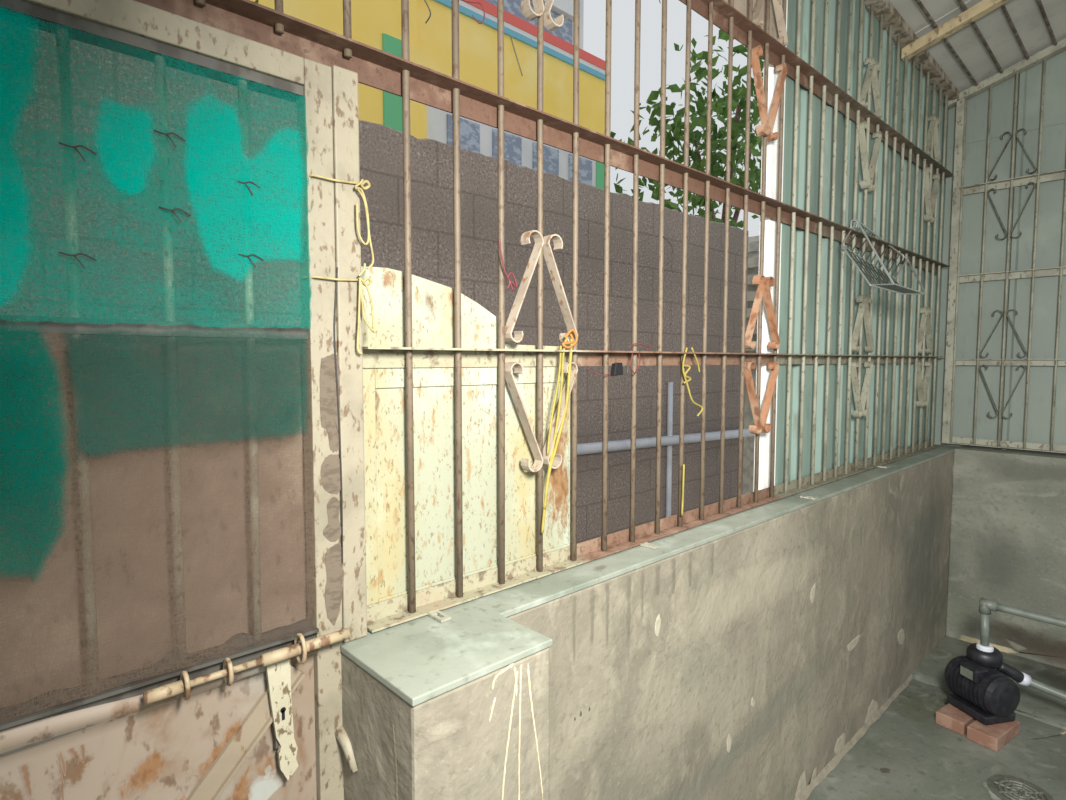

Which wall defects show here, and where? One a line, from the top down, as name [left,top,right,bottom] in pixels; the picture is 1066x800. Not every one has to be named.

peeling [320,354,343,625]
corrosion [545,401,569,539]
corrosion [0,763,36,800]
corrosion [55,744,96,800]
corrosion [115,747,168,800]
corrosion [175,706,252,800]
corrosion [224,732,277,800]
peeling [248,764,285,800]